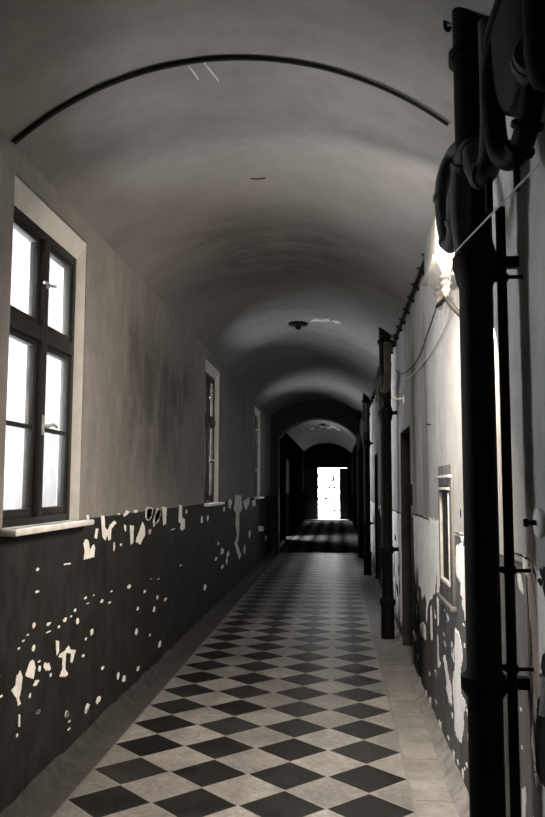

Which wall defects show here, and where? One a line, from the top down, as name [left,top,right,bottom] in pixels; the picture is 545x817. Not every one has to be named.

peeling [83,505,187,560]
peeling [215,495,267,569]
peeling [0,622,84,737]
peeling [413,515,468,745]
peeling [515,555,545,817]